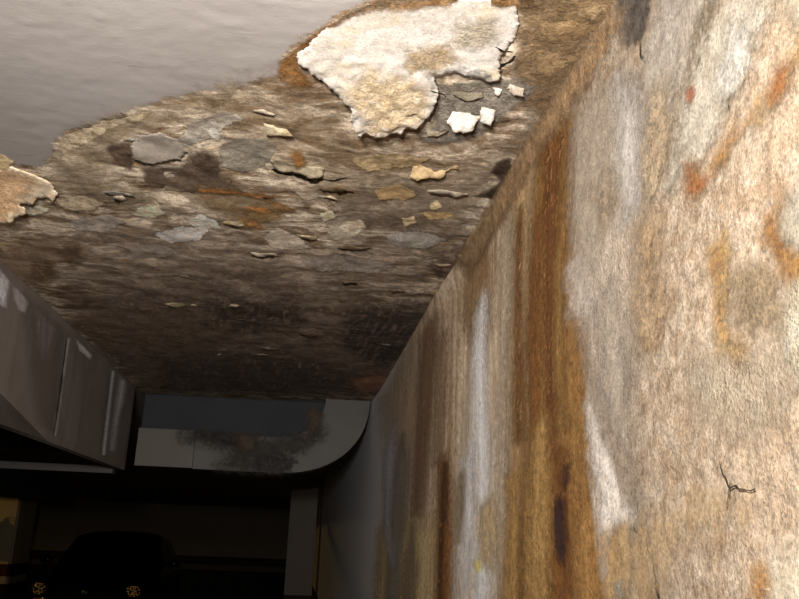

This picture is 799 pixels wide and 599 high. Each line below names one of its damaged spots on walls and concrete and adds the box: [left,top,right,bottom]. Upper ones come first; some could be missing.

rust [713,39,799,166]
peeling [0,0,544,401]
rust [461,115,611,599]
water stain [452,0,799,599]
rust [762,208,799,289]
water stain [70,279,453,599]
rust [434,454,454,599]
crack [627,469,660,599]
crack [719,461,755,509]